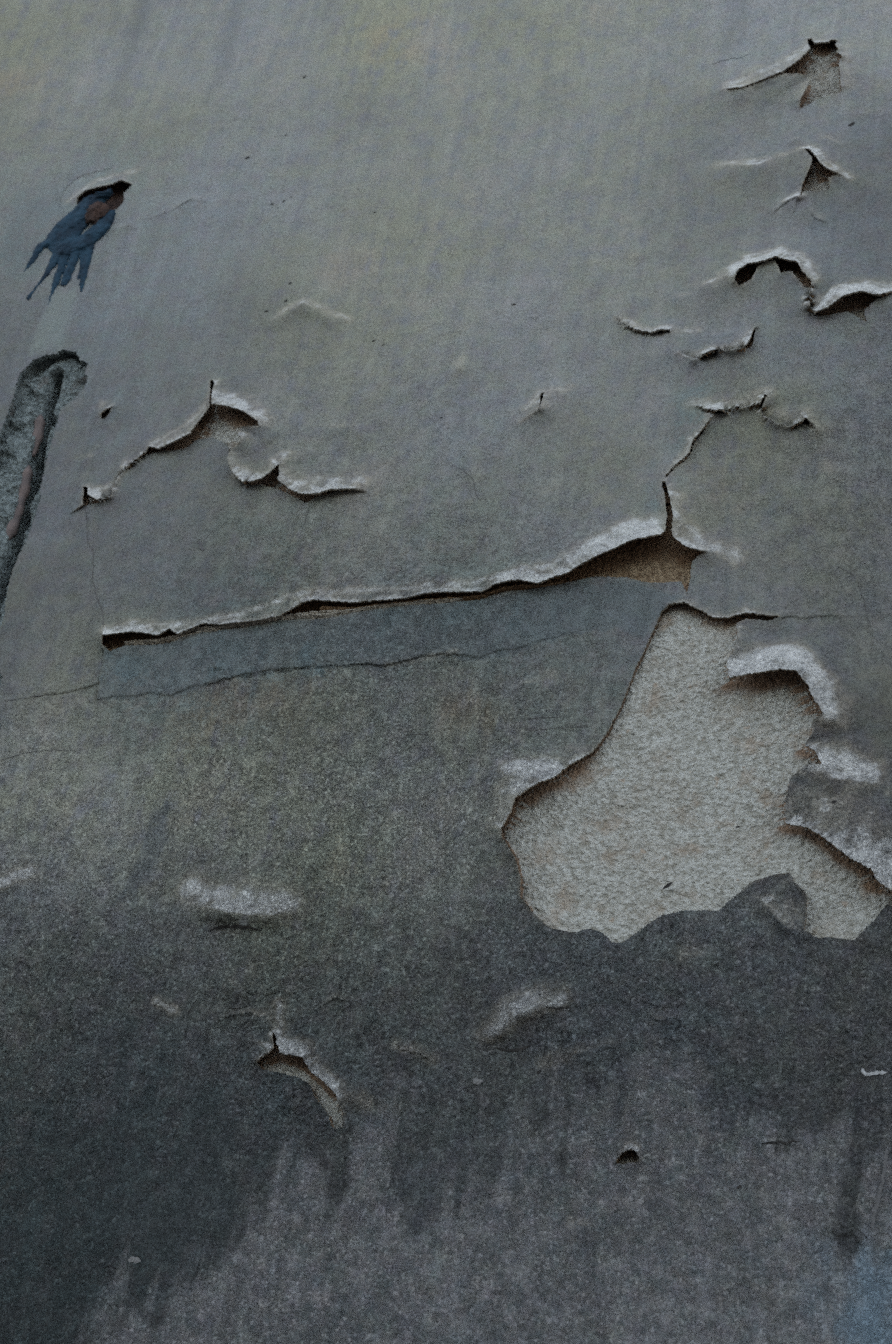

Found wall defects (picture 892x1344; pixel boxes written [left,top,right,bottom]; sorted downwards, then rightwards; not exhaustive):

peeling [60,163,149,212]
flaking render [679,15,887,216]
spalling [0,350,88,442]
flaking render [40,359,390,522]
crack [72,407,743,665]
flaking render [601,233,892,456]
flaking render [455,573,892,948]